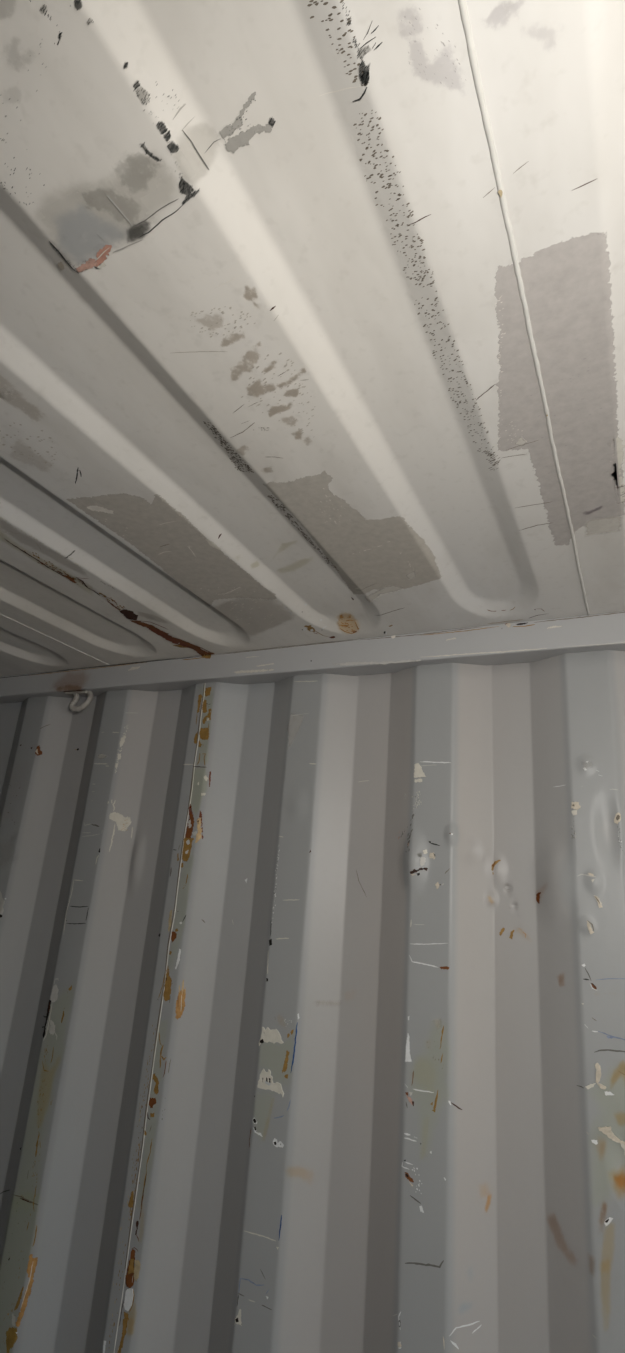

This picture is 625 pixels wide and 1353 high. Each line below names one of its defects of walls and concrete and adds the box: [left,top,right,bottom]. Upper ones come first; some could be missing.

peeling [611,436,625,503]
rust [5,539,214,660]
rust [302,615,359,638]
rust [183,687,212,767]
rust [170,804,203,886]
rust [159,910,186,1020]
peeling [259,1027,284,1046]
peeling [257,1069,284,1097]
rust [106,1025,171,1353]
rust [4,1222,38,1353]